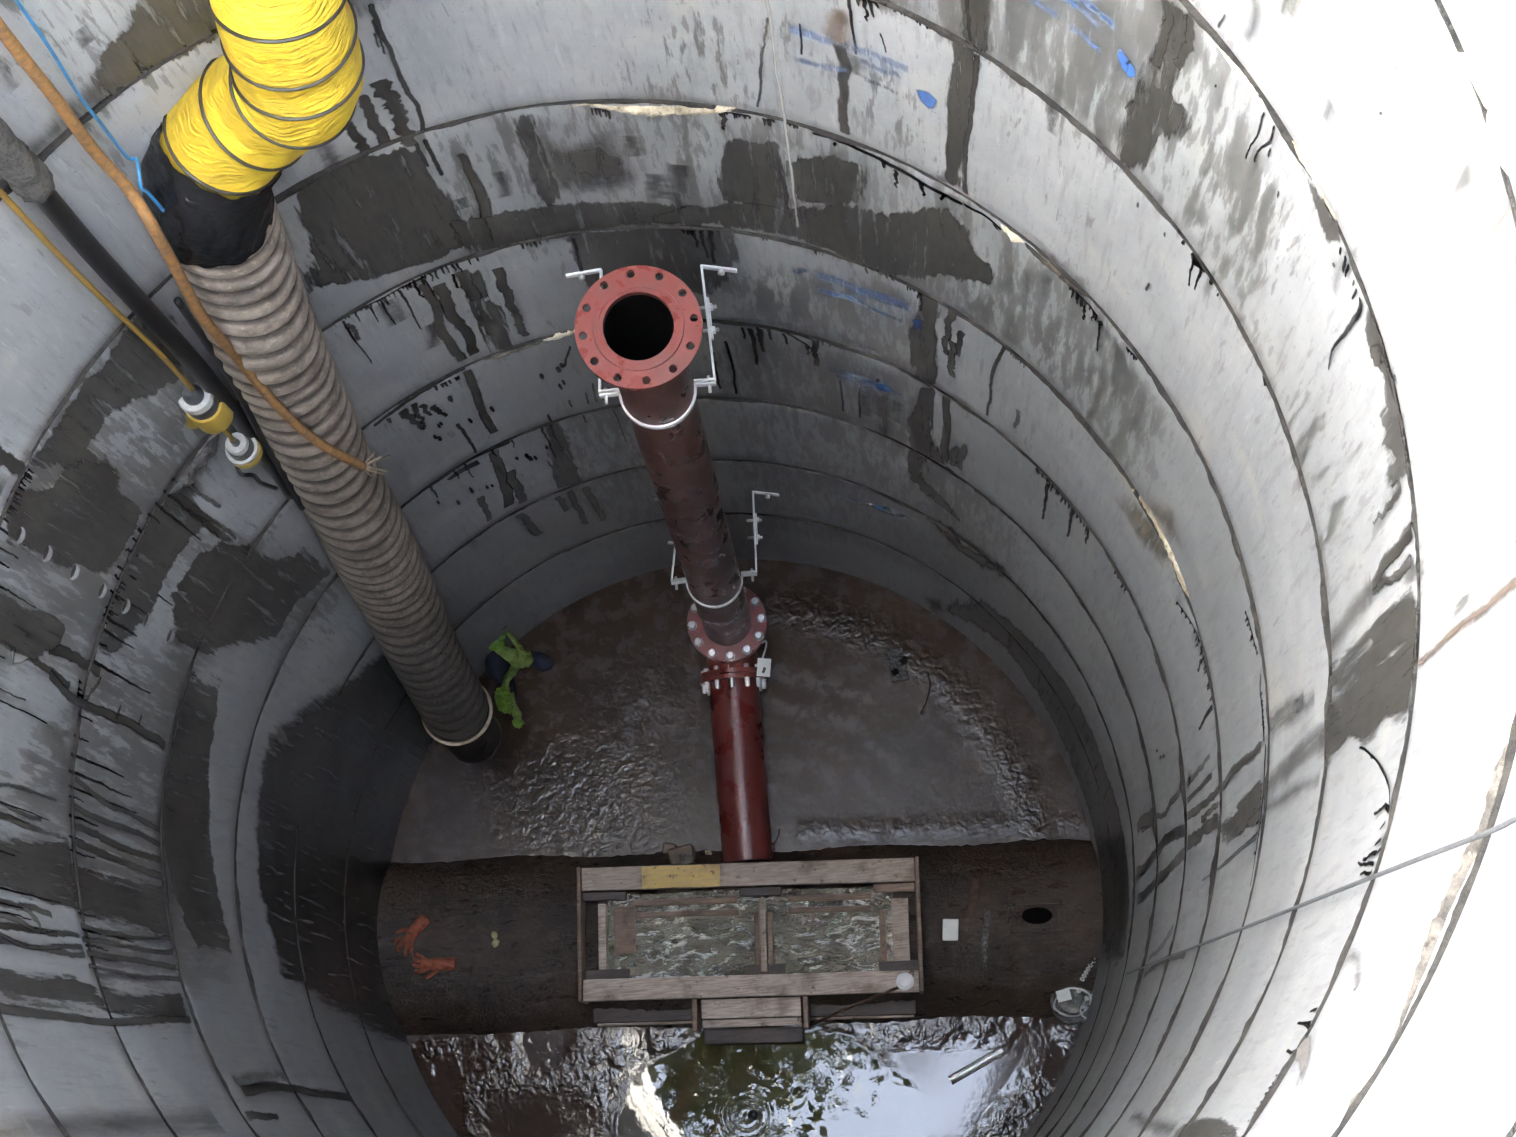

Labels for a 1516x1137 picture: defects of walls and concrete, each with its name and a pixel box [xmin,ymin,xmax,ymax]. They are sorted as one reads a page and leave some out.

damp [1118,0,1194,169]
damp [294,0,1001,536]
damp [1309,184,1342,267]
damp [987,409,1020,448]
damp [1365,310,1408,524]
damp [1128,509,1171,554]
damp [0,318,330,1026]
damp [932,522,1419,959]
damp [1161,1103,1261,1137]